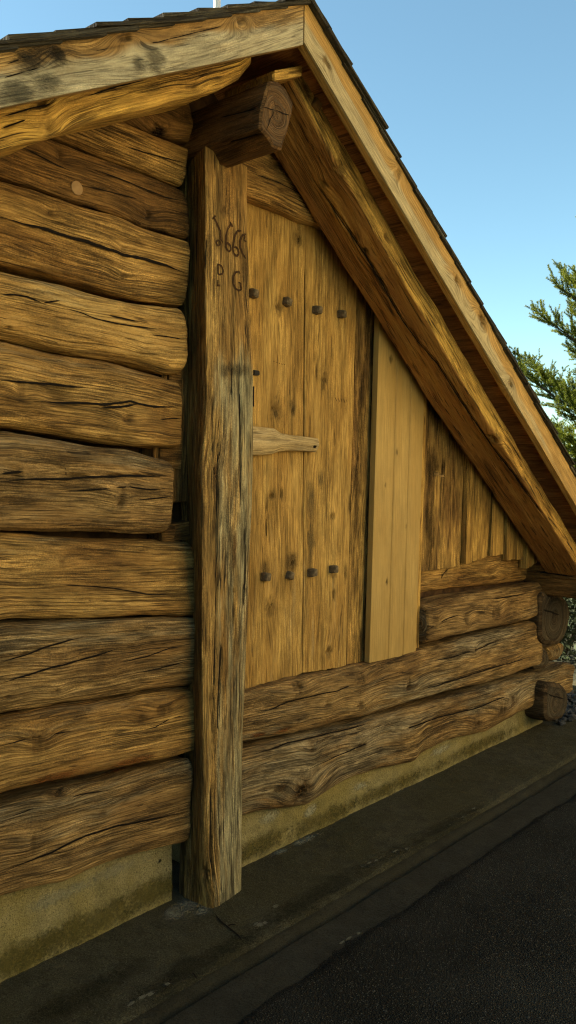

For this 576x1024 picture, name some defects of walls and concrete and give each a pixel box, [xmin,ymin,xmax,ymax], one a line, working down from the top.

crack [1,380,180,420]
crack [2,814,174,873]
damp [18,875,208,962]